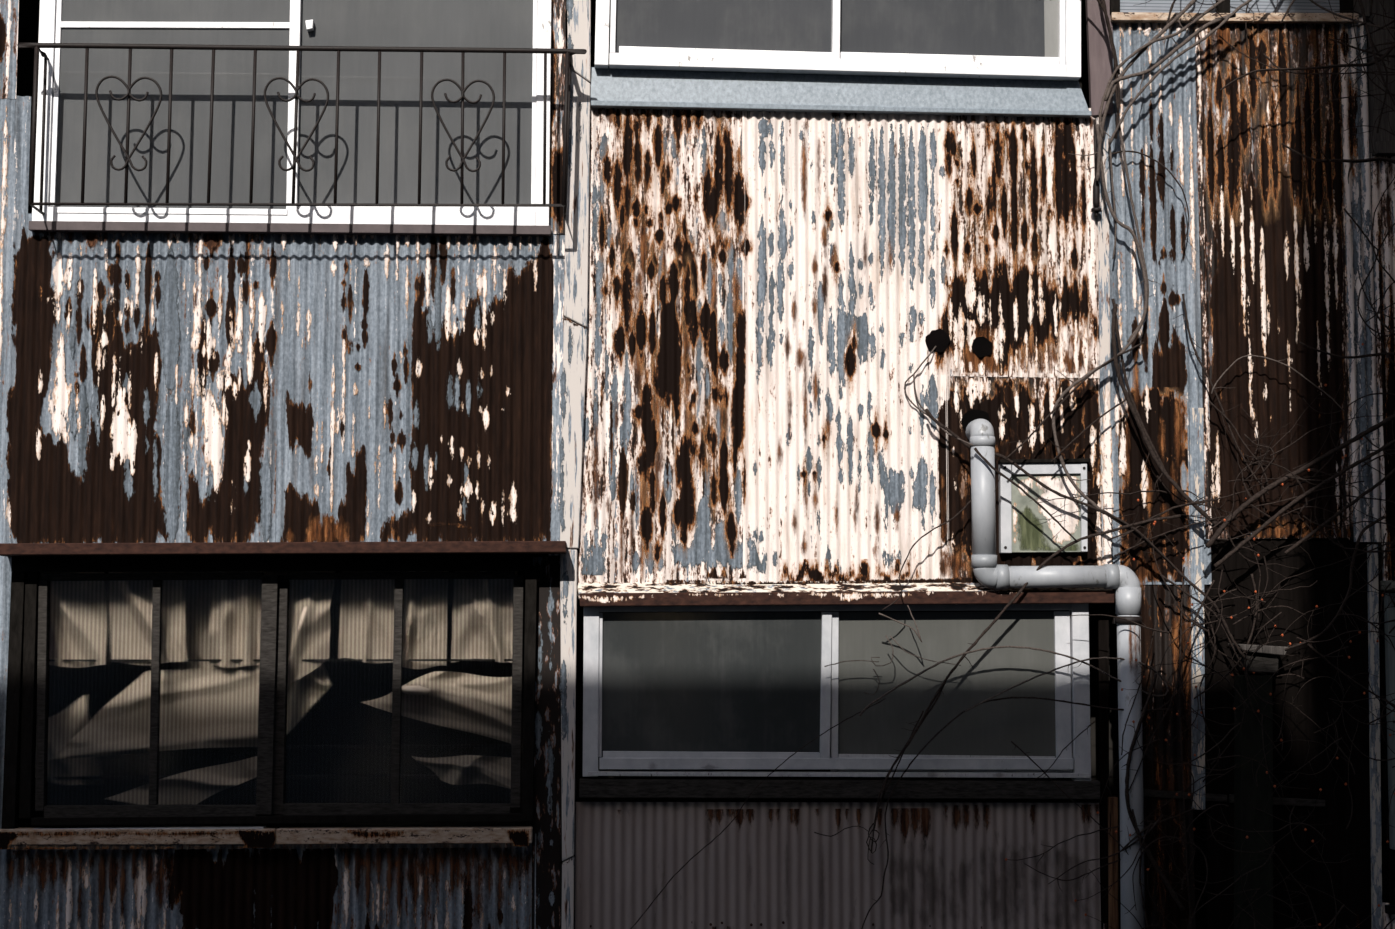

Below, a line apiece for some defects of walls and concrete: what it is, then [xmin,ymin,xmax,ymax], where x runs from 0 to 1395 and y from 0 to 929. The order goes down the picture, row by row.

peeling [0,108,8,376]
peeling [36,232,540,543]
peeling [663,125,713,179]
peeling [693,115,804,449]
corrosion [593,108,1101,585]
peeling [797,116,1090,571]
corrosion [1118,100,1191,929]
corrosion [1205,24,1358,538]
corrosion [1376,156,1395,580]
peeling [55,860,166,929]
peeling [338,865,351,929]
corrosion [707,805,989,844]